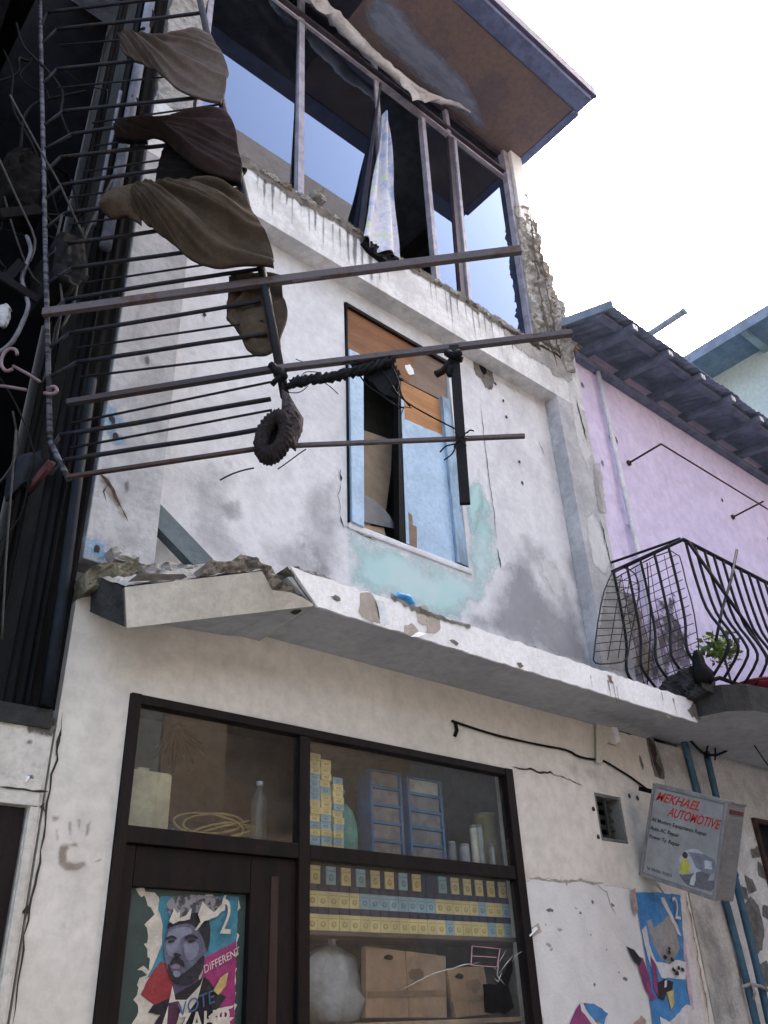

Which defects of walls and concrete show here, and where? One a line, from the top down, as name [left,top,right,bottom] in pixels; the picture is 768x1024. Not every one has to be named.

spalling [239,152,369,240]
spalling [389,194,652,679]
spalling [187,554,314,615]
peeling [359,592,470,637]
leakage [495,565,587,663]
crack [514,767,579,784]
spalling [741,846,768,988]